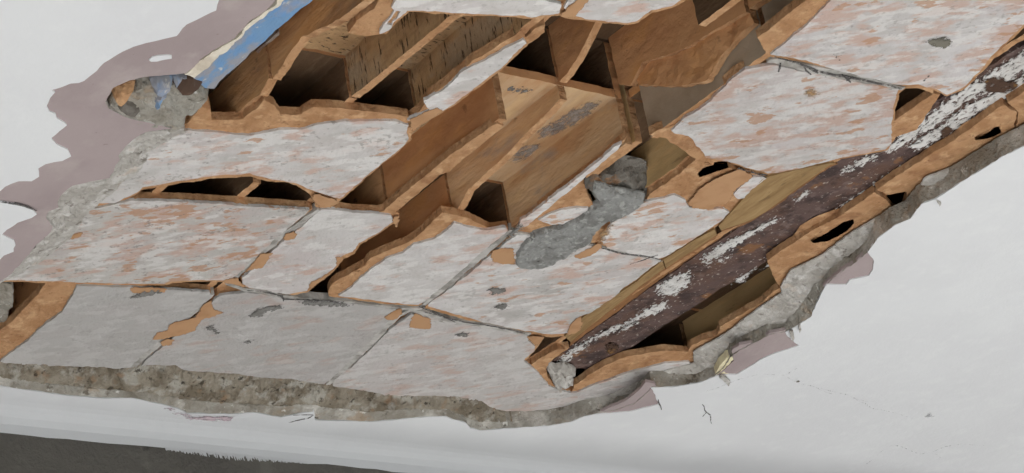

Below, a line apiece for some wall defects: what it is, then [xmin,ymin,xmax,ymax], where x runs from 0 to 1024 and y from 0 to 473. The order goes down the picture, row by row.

spalling [561,0,589,18]
crack [775,56,896,88]
rust [981,77,1018,93]
spalling [410,108,442,131]
peeling [841,49,1024,176]
peeling [0,0,275,281]
spalling [0,124,1024,430]
crack [251,290,344,302]